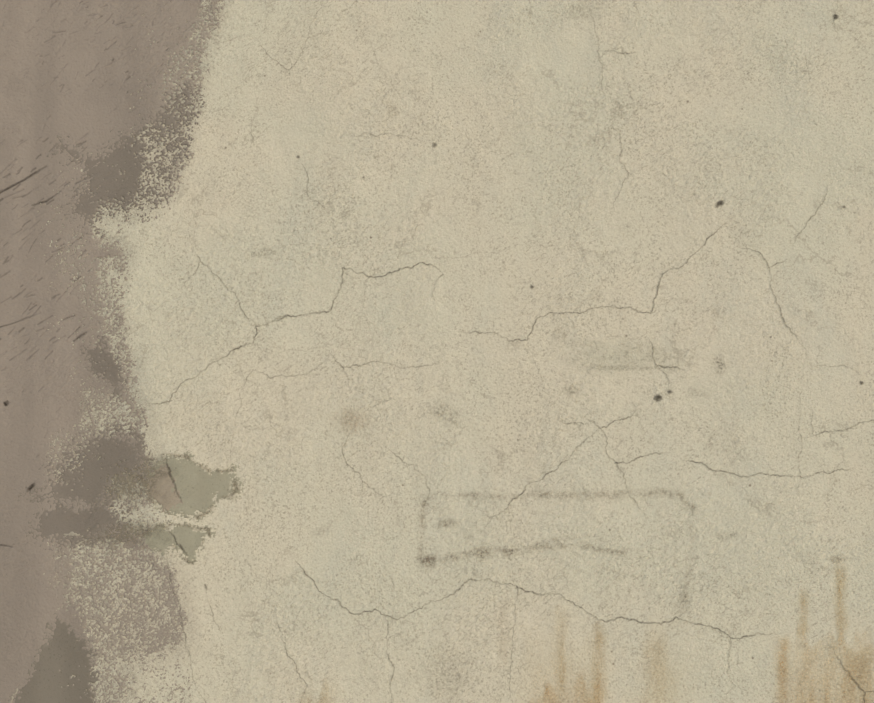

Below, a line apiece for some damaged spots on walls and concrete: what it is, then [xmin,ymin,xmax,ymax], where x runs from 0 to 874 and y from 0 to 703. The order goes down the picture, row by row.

spalling [105,450,244,565]